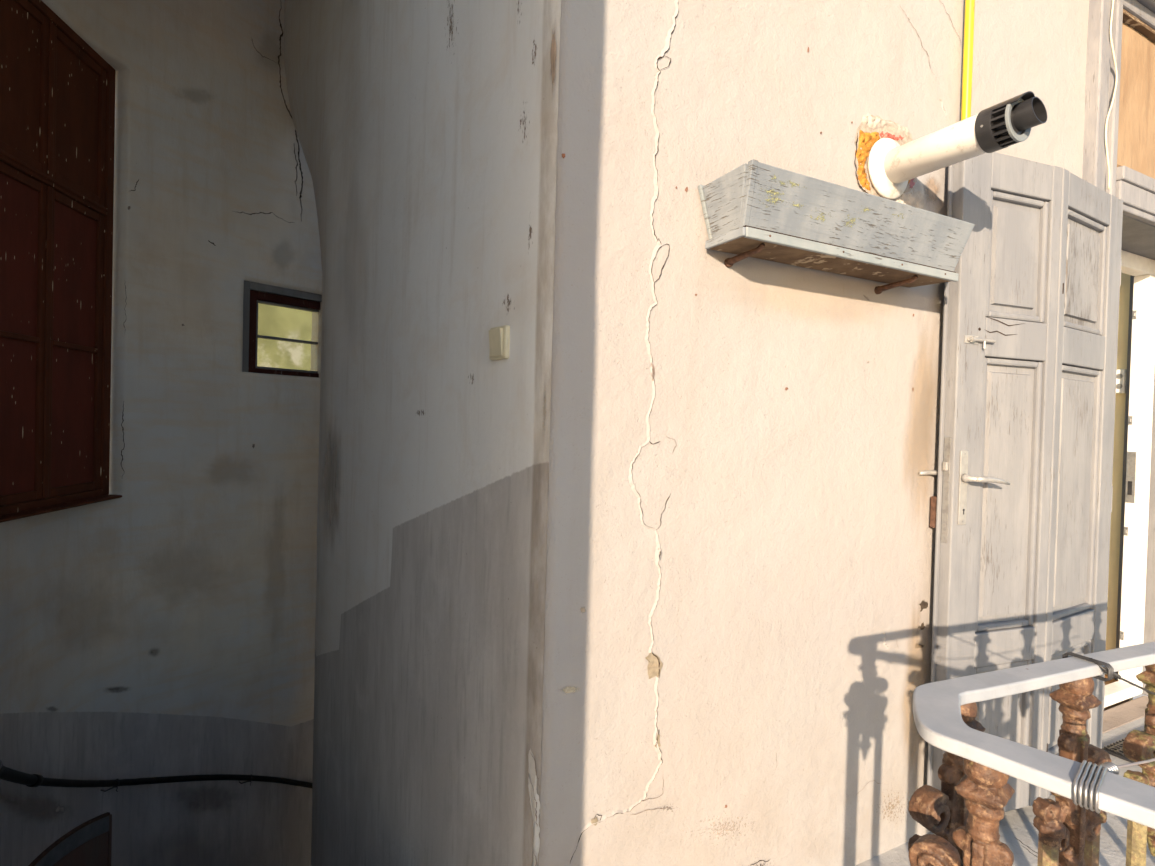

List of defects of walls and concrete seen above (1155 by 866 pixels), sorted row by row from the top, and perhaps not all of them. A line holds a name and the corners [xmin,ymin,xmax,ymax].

crack [234,0,303,223]
crack [563,0,679,866]
flaking render [646,653,663,679]